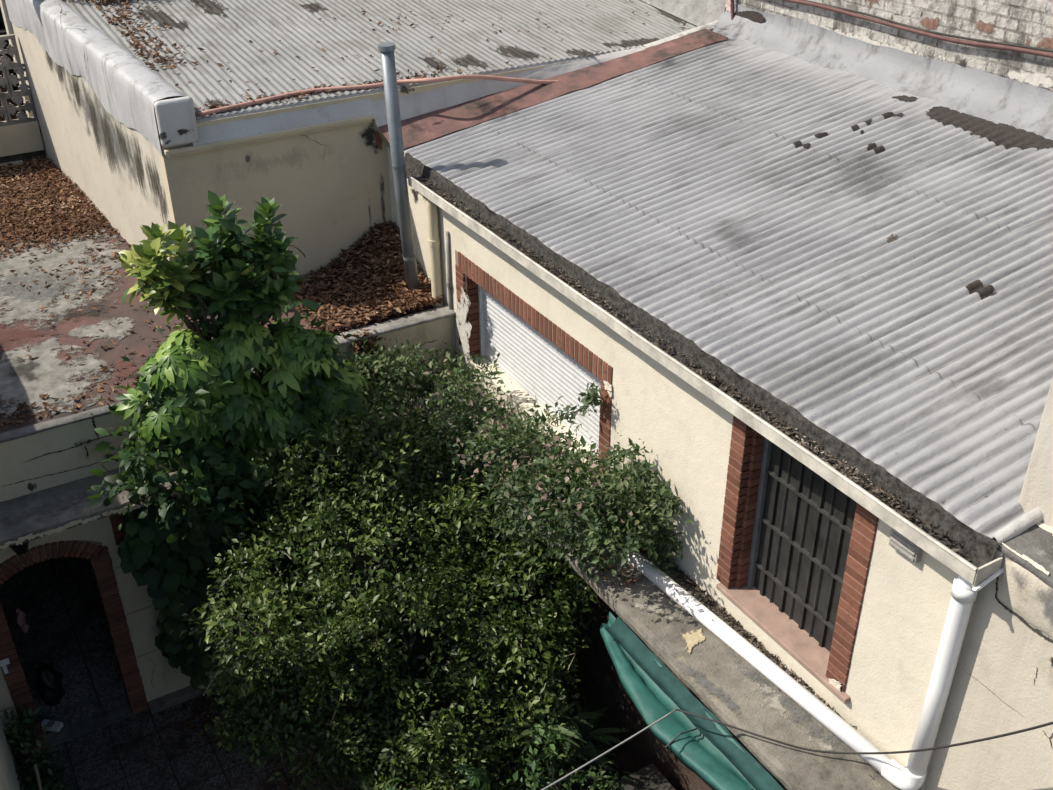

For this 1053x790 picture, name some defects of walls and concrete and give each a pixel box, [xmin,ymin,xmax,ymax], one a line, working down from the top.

water stain [735,11,764,24]
peeling [810,22,946,61]
water stain [45,52,165,224]
peeling [0,324,58,352]
crack [1,413,140,487]
peeling [0,498,157,551]
peeling [1002,543,1049,575]
crack [995,577,1053,643]
water stain [1036,587,1053,622]
peeling [682,628,705,653]
crack [964,670,1053,747]